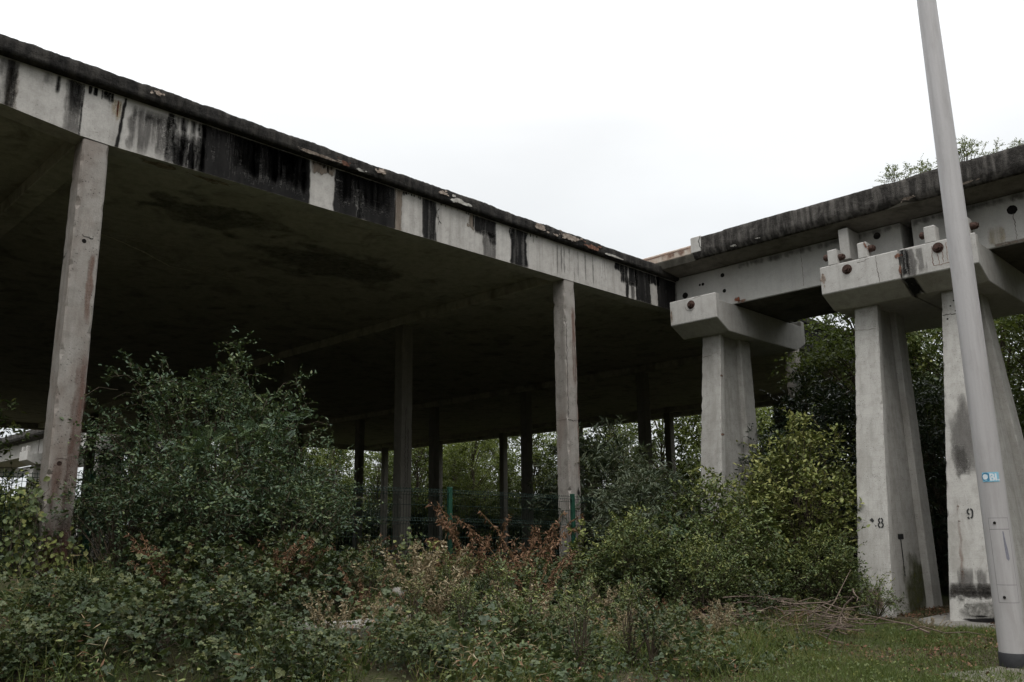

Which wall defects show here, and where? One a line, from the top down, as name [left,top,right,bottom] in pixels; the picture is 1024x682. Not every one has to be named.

water stain [56,76,496,258]
spalling [439,190,472,207]
water stain [509,227,537,268]
water stain [593,259,676,310]
water stain [951,399,975,471]
water stain [950,570,992,599]